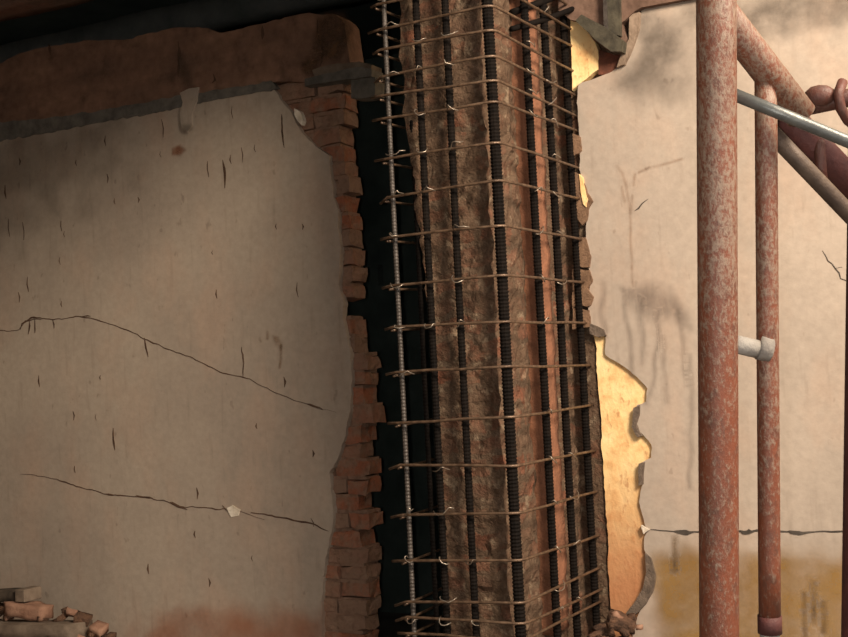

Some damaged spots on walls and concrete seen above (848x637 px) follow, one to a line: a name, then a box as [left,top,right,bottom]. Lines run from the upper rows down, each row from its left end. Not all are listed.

peeling [570,20,621,92]
flaking render [572,133,582,159]
flaking render [575,172,594,226]
crack [0,315,334,412]
peeling [572,237,656,617]
crack [21,474,327,531]
crack [650,528,699,536]
crack [739,527,758,535]
crack [780,528,842,536]
leakage [656,554,699,637]
leakage [739,561,760,637]
leakage [780,559,842,637]